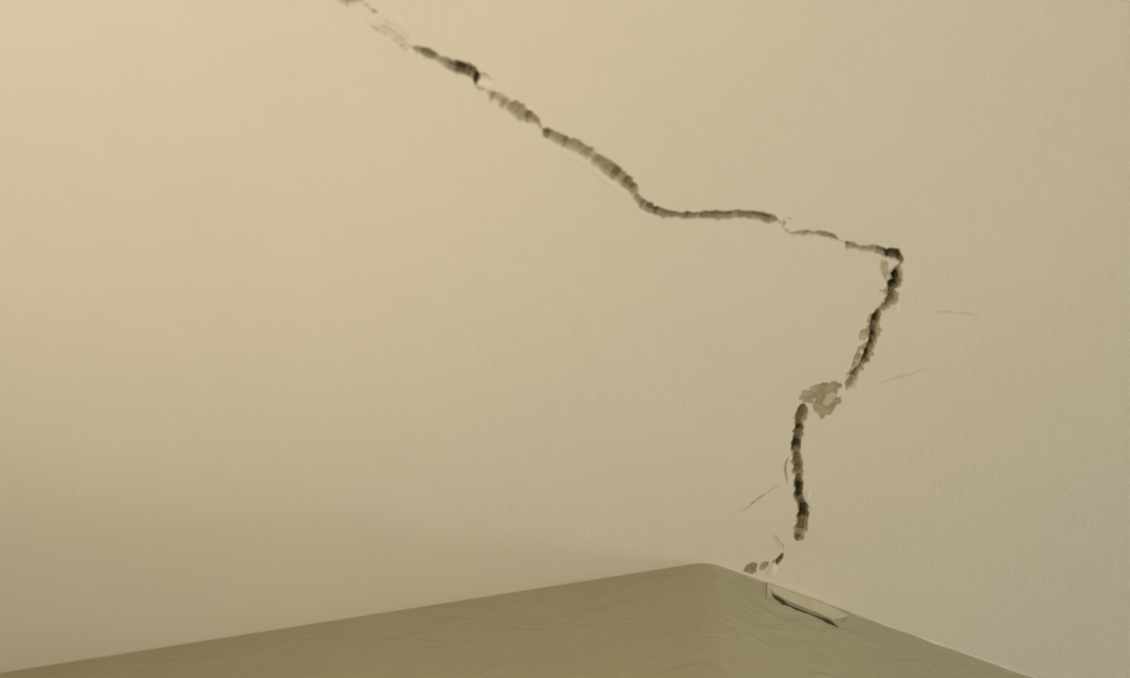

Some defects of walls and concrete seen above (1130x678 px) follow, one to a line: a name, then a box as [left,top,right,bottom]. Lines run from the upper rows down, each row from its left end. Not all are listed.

crack [339,0,926,390]
crack [739,403,815,565]